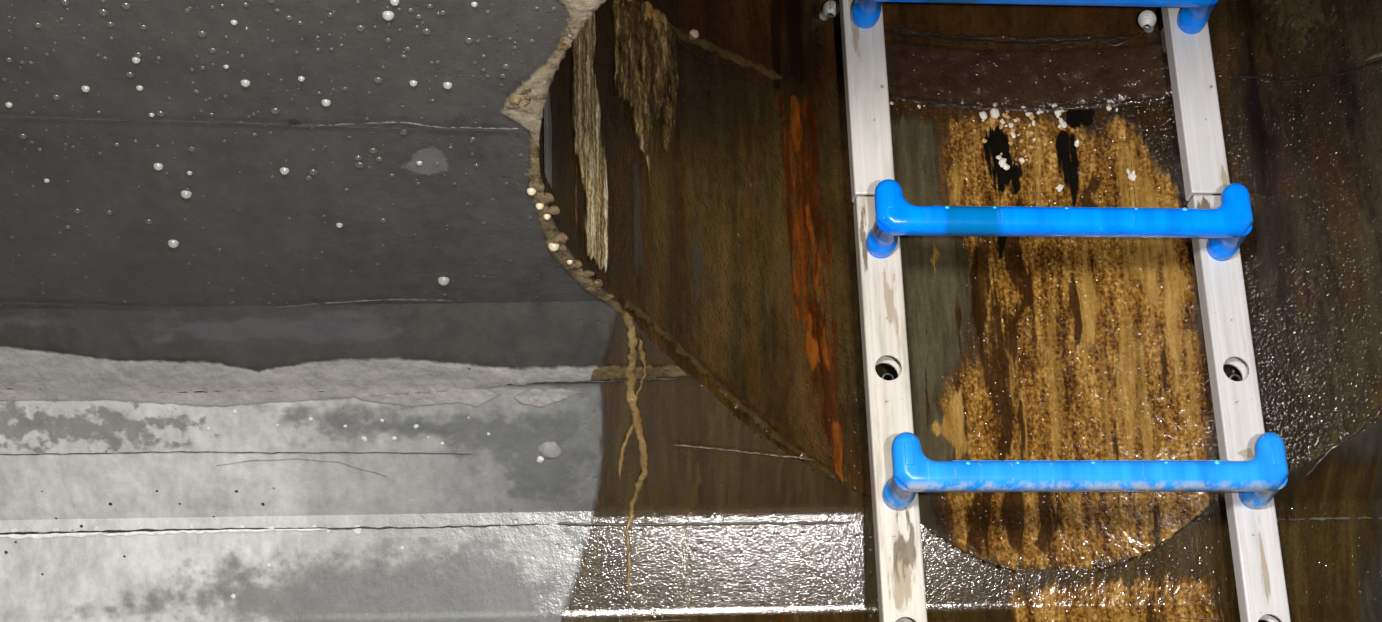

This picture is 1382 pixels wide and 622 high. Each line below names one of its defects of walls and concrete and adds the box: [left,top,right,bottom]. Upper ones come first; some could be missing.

leakage [401,146,448,175]
leakage [889,99,1182,208]
leakage [502,0,880,622]
corrosion [779,94,845,482]
leakage [882,235,1214,461]
leakage [128,553,537,622]
leakage [276,409,583,497]
leakage [918,492,1241,622]
leakage [1274,389,1382,622]